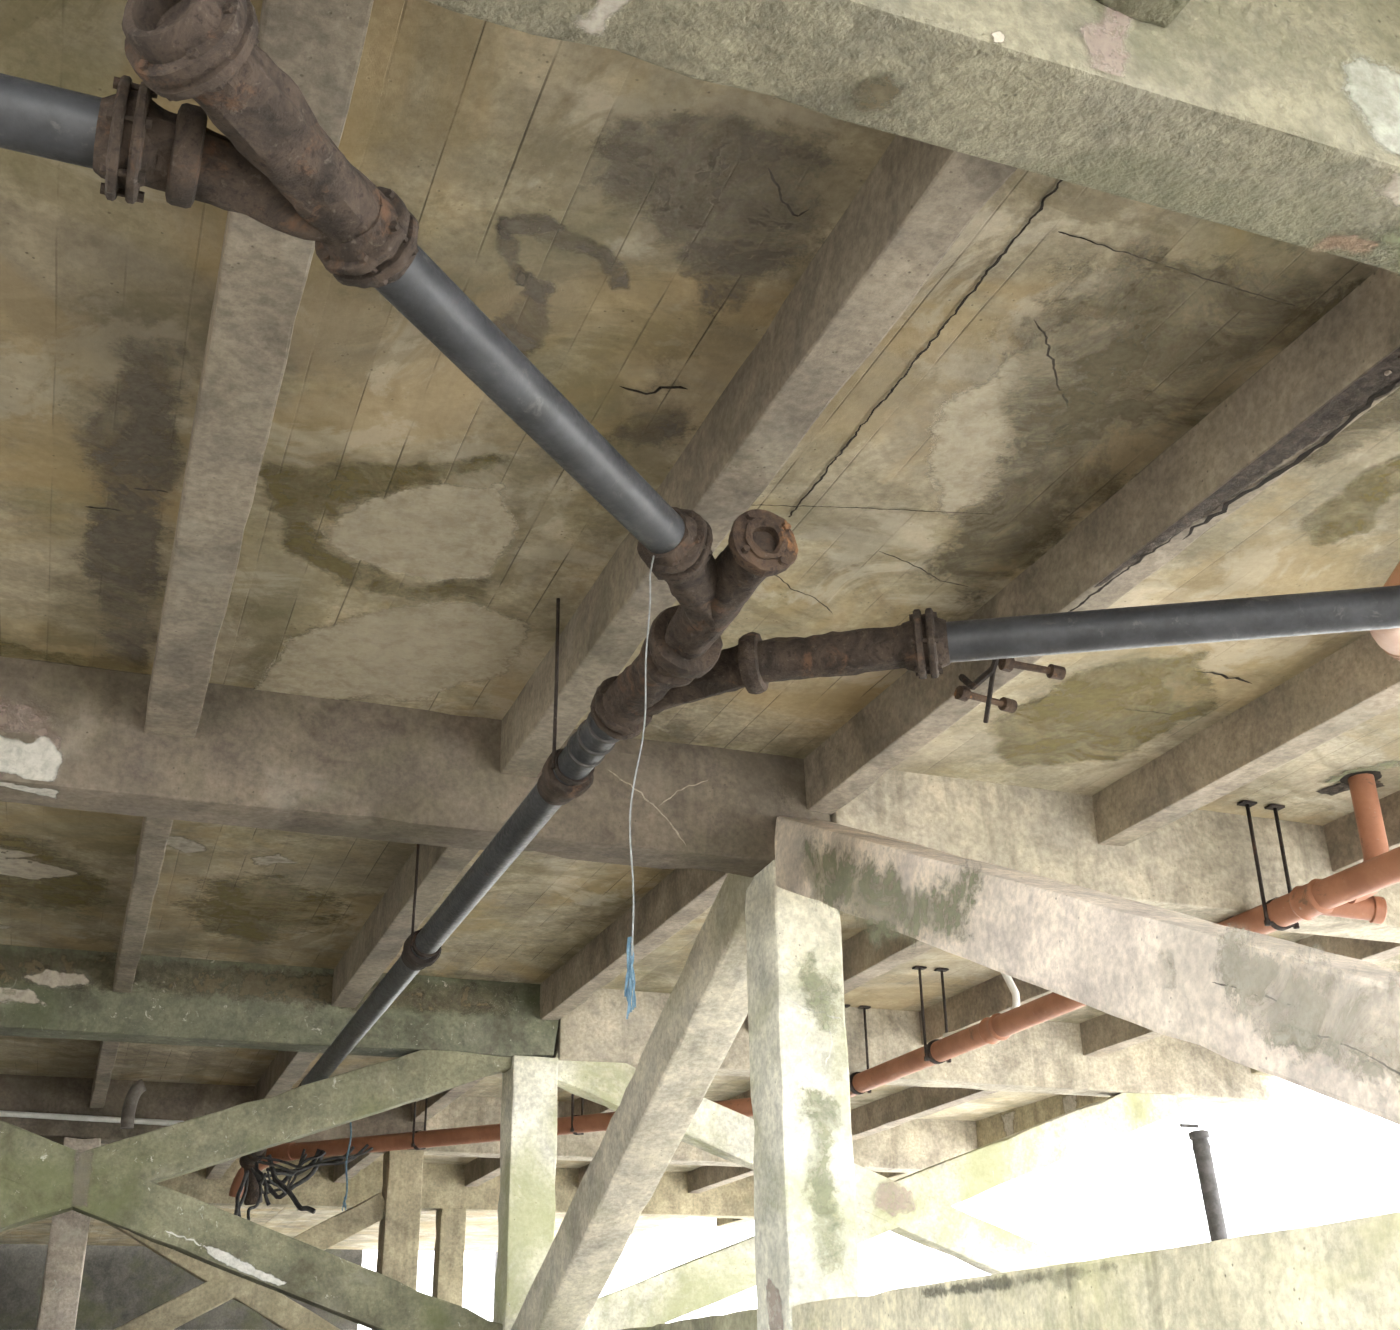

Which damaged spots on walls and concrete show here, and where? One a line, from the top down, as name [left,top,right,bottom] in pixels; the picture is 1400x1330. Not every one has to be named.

peeling [1345,59,1400,155]
leakage [493,215,629,355]
crack [620,386,687,395]
crack [751,180,1152,517]
leakage [77,344,185,666]
leakage [1314,458,1400,546]
peeling [0,701,62,798]
leakage [997,653,1216,766]
peeling [0,847,77,880]
peeling [0,969,89,1004]
crack [1212,982,1295,1024]
crack [1317,1035,1400,1075]